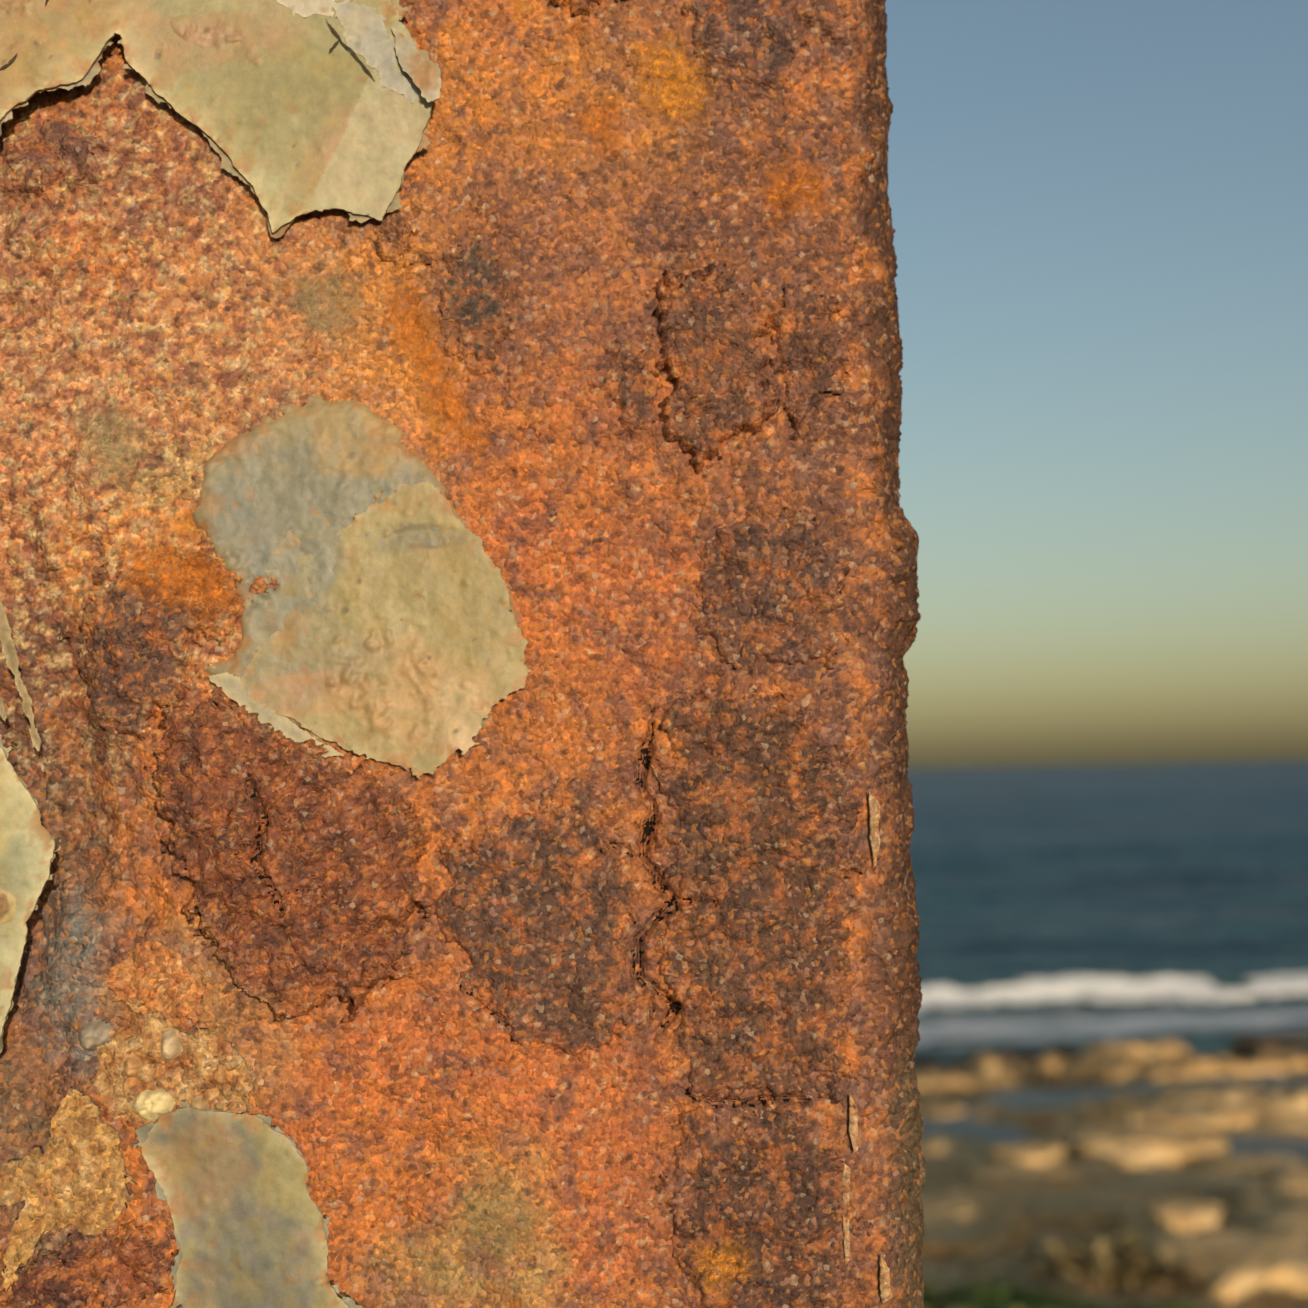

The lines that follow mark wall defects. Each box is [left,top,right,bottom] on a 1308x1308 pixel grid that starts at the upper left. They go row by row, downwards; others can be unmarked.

peeling [0,0,442,239]
corrosion [369,211,512,364]
corrosion [645,0,816,116]
corrosion [605,259,856,473]
corrosion [769,174,820,206]
peeling [192,396,532,779]
peeling [0,602,61,1053]
corrosion [56,505,874,1308]
crack [596,700,721,1035]
peeling [0,940,363,1308]